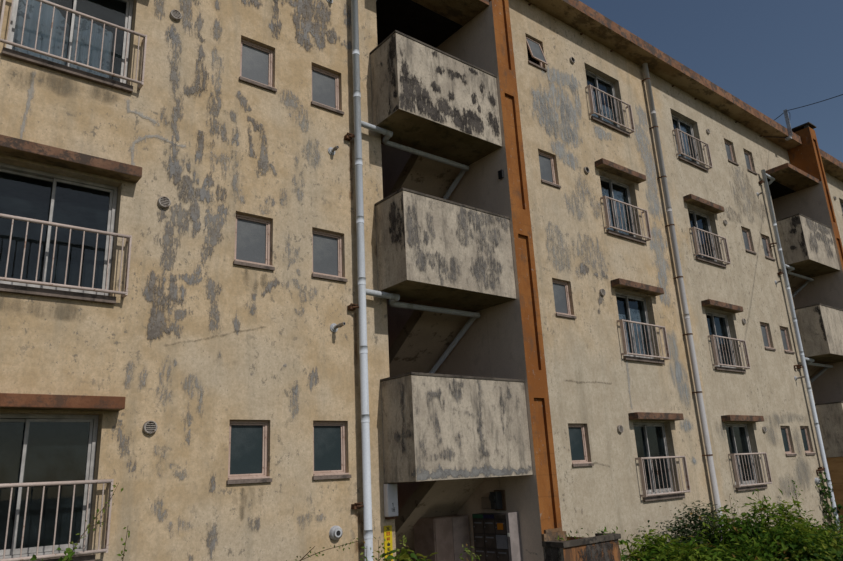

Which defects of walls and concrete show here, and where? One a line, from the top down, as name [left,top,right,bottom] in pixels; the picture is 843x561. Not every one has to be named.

water stain [381,34,500,140]
water stain [389,196,461,284]
water stain [456,207,508,289]
water stain [420,378,464,461]
water stain [466,381,490,459]